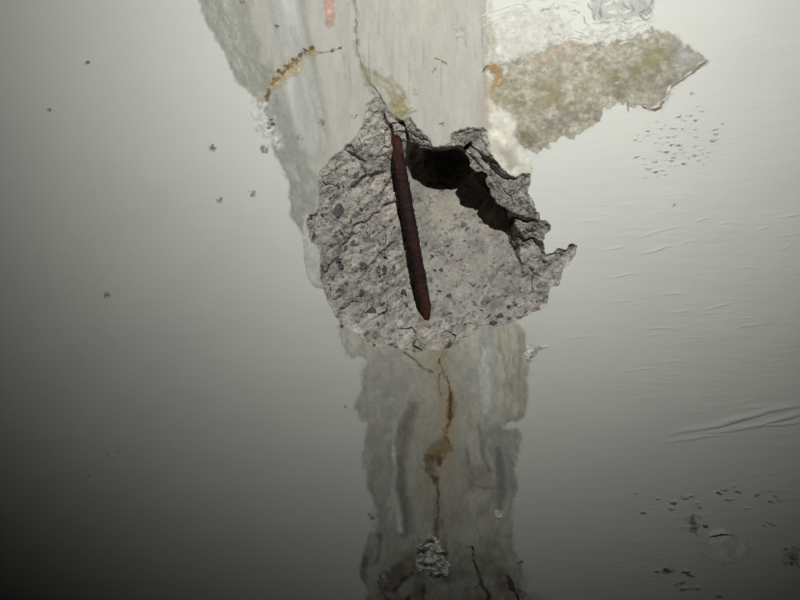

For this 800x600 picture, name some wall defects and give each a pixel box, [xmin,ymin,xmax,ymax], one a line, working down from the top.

rust [264,45,320,101]
peeling [478,0,708,153]
spalling [306,97,577,352]
crack [403,351,452,443]
leakage [339,322,529,600]
rust [425,377,457,483]